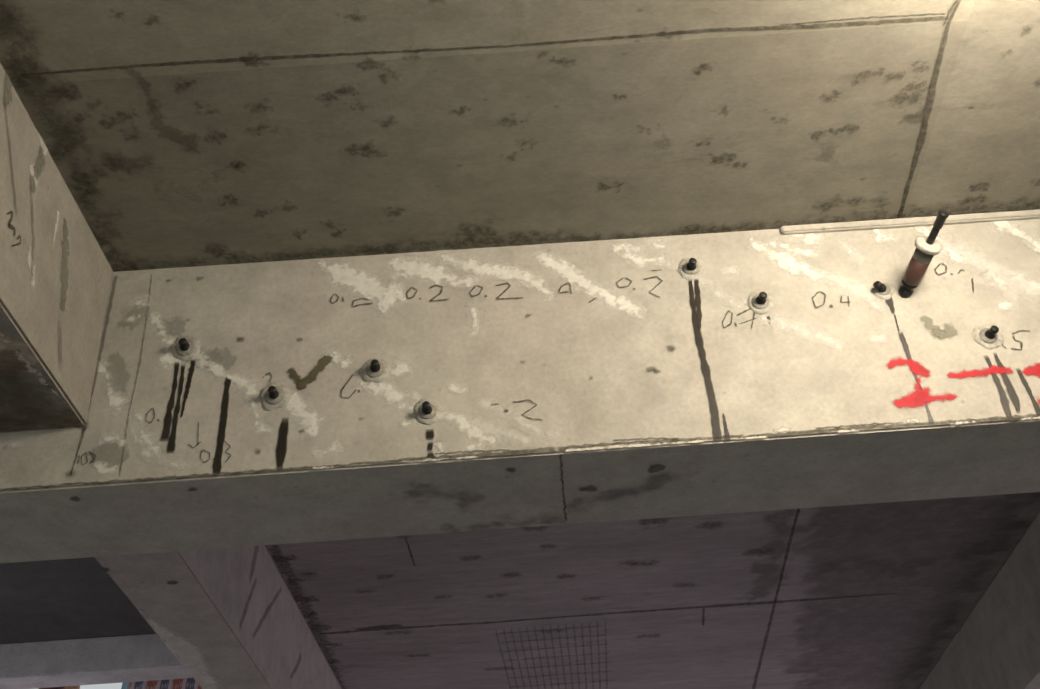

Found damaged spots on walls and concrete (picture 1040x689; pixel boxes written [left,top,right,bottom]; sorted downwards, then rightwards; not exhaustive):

crack [4,0,960,216]
damp [856,68,924,121]
crack [55,211,69,311]
damp [346,227,583,256]
damp [945,186,1040,214]
crack [0,374,1040,518]